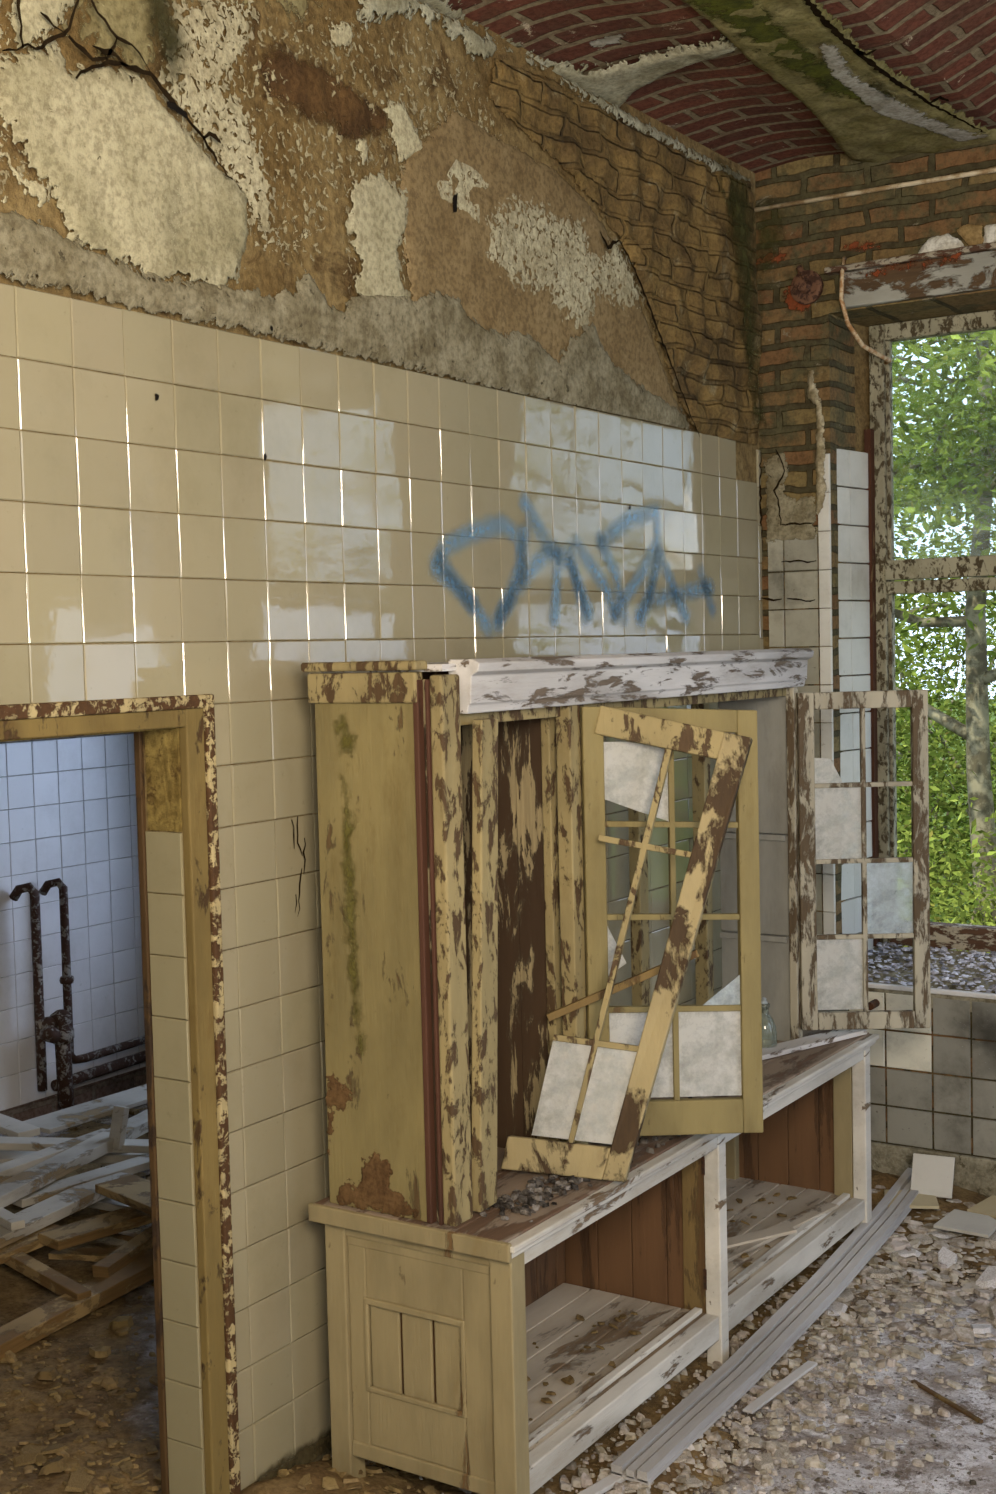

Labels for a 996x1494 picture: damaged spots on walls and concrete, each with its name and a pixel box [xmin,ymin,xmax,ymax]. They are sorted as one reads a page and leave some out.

crack [2,0,233,180]
crack [804,0,985,133]
peeling [819,44,987,141]
flaking render [0,0,763,445]
flaking render [918,224,996,253]
flaking render [763,370,827,544]